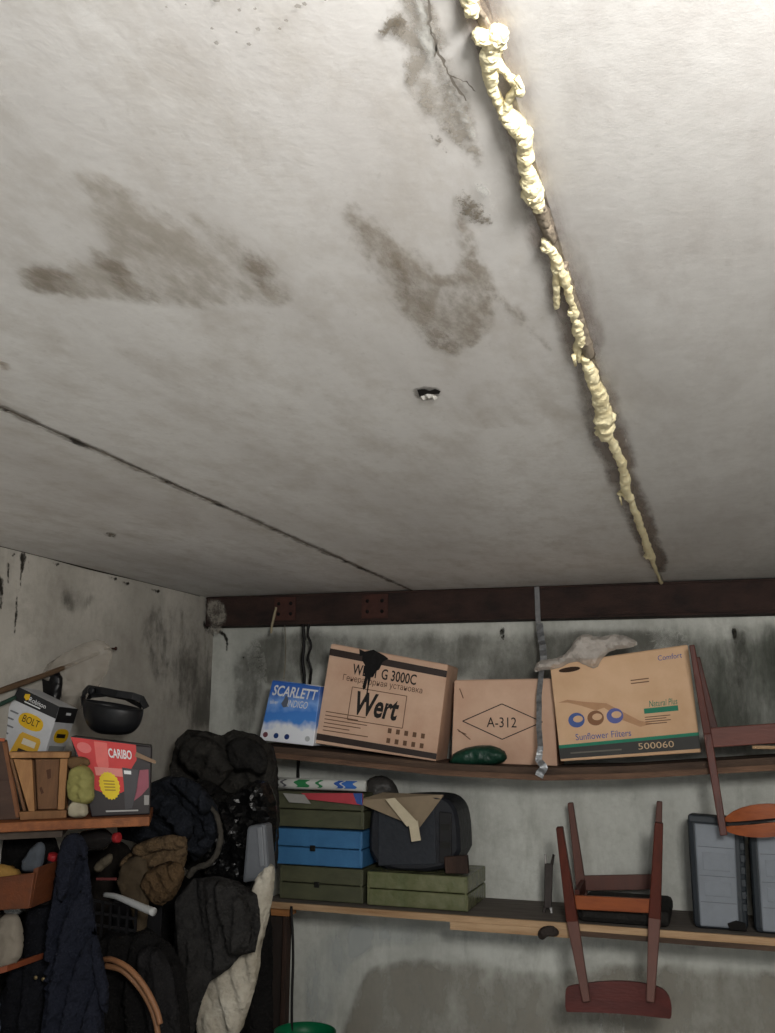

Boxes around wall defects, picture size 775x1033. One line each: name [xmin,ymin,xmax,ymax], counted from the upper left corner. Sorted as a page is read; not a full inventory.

leakage [419,5,435,53]
crack [428,0,475,101]
leakage [460,0,505,26]
leakage [501,48,513,72]
leakage [551,285,665,572]
leakage [0,553,26,609]
leakage [345,962,775,1033]